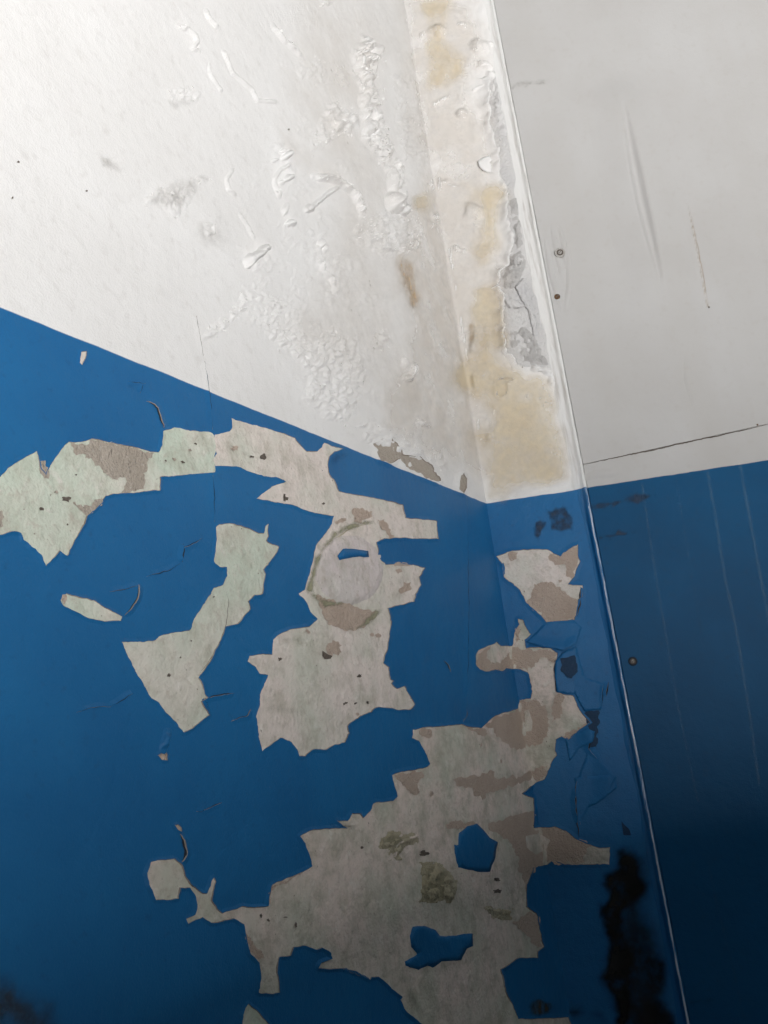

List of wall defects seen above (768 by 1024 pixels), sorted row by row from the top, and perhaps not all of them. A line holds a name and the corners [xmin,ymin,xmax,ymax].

peeling [0,416,442,764]
spalling [368,436,472,499]
damp [405,176,557,481]
peeling [142,541,617,1024]
damp [601,850,674,1024]